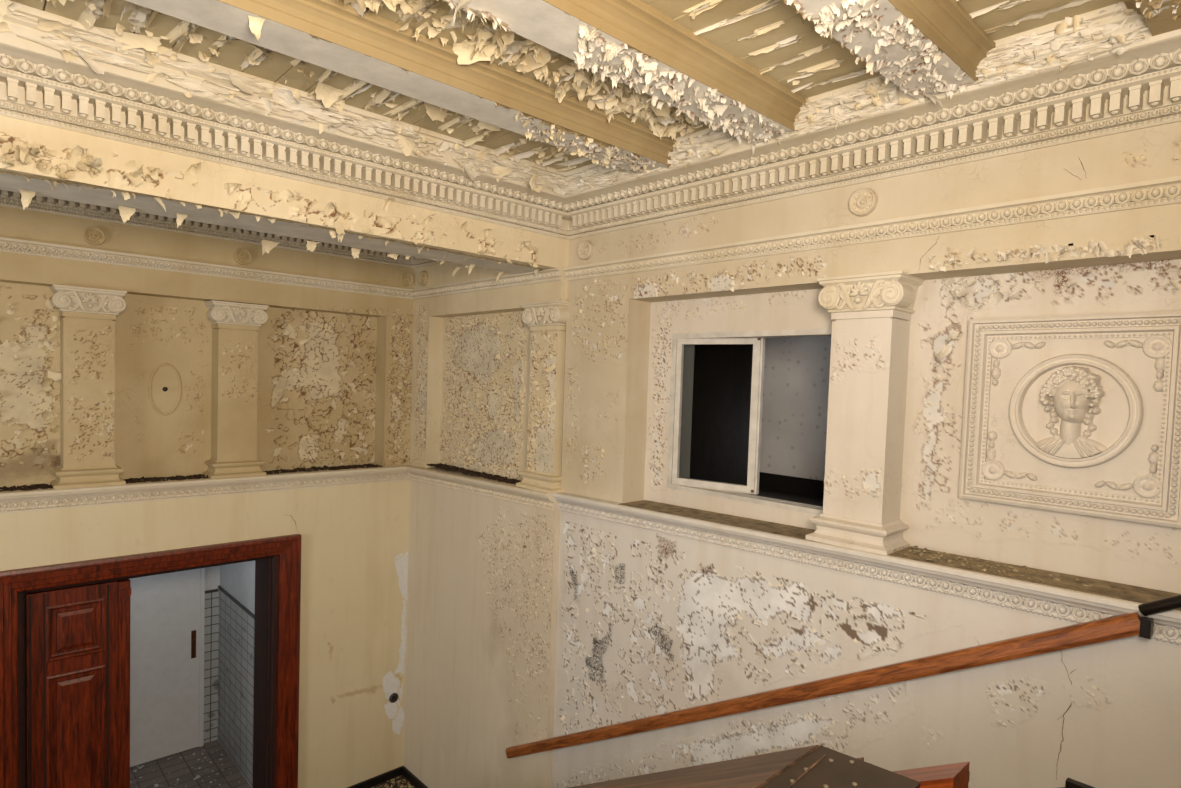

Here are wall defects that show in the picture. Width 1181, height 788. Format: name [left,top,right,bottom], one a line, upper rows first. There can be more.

peeling [0,0,1181,198]
peeling [0,128,543,282]
peeling [0,285,115,478]
peeling [218,303,557,480]
peeling [581,249,838,492]
peeling [910,235,1181,571]
peeling [475,504,962,754]
peeling [554,679,919,788]
crack [1055,650,1077,779]